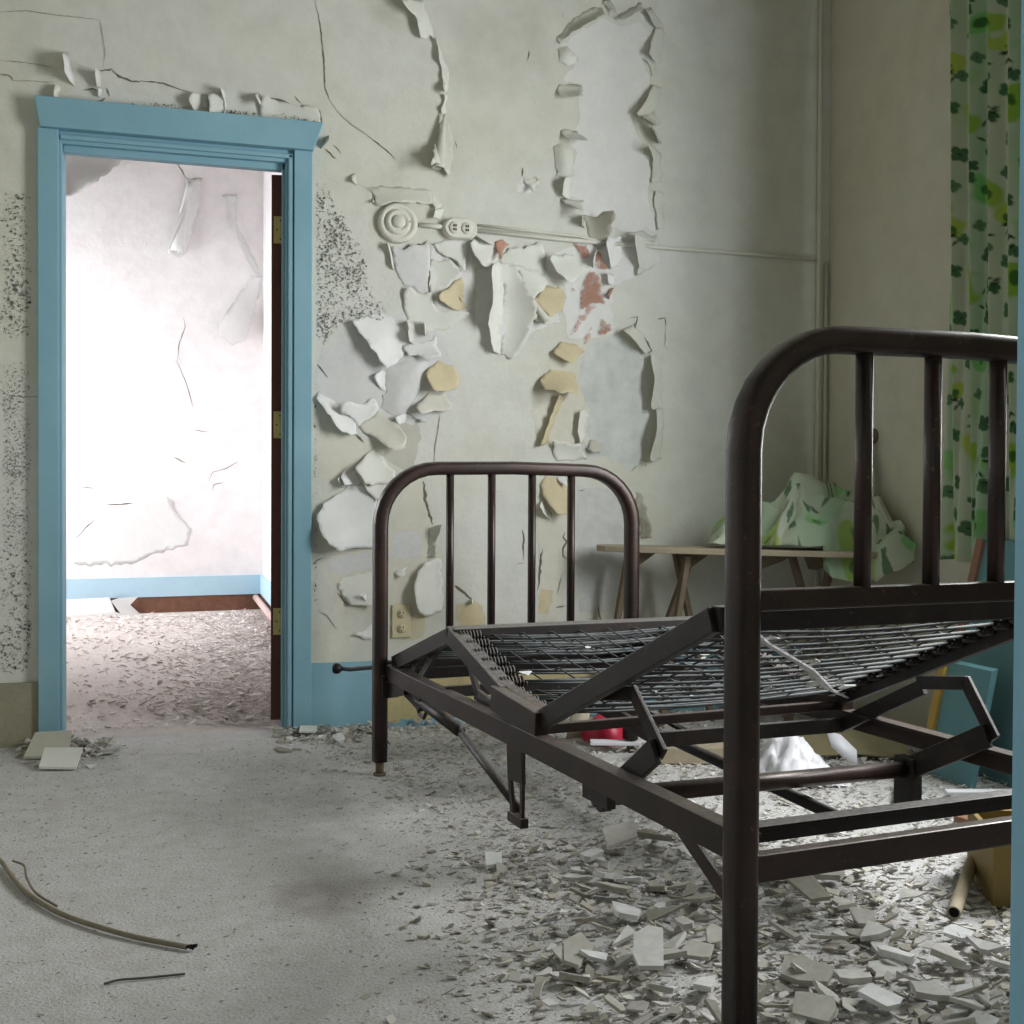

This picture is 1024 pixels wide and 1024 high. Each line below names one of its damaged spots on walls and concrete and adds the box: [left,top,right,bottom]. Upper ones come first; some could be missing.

crack [0,60,49,82]
crack [8,10,106,68]
peeling [53,52,227,113]
peeling [255,93,322,122]
crack [315,2,394,158]
water stain [0,191,32,339]
peeling [219,194,263,346]
water stain [316,184,383,342]
peeling [313,0,666,641]
corrosion [573,243,611,344]
water stain [0,362,32,674]
peeling [71,497,192,567]